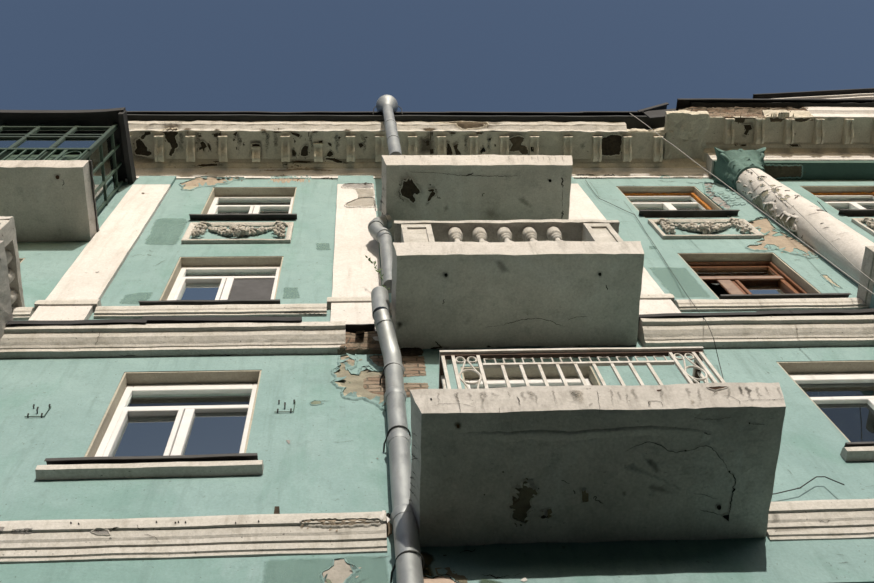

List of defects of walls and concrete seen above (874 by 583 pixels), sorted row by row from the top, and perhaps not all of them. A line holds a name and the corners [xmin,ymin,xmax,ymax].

peeling [133,124,246,191]
spalling [509,134,534,155]
spalling [602,133,623,157]
spalling [398,177,440,204]
flaking render [659,163,821,260]
flaking render [330,330,387,411]
crack [625,417,736,522]
flaking render [507,478,554,527]
flaking render [320,558,361,583]
flaking render [423,574,460,583]